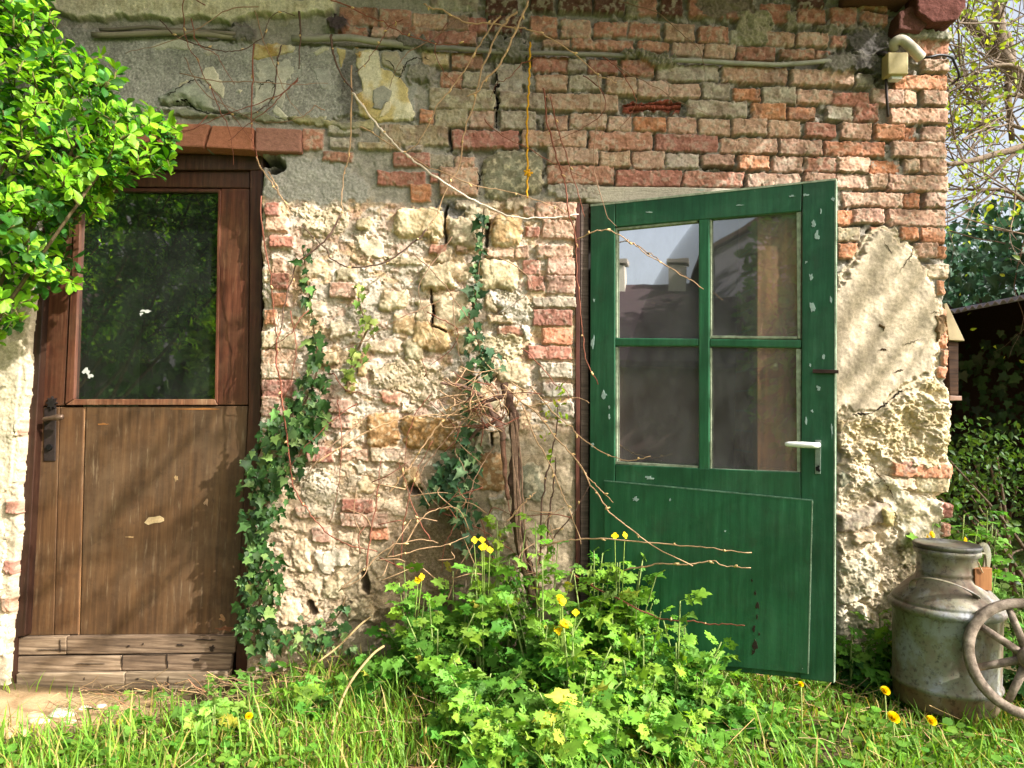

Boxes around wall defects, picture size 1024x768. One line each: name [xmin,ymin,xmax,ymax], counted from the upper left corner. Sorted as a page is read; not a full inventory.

peeling [252,42,295,121]
peeling [311,46,416,123]
crack [493,67,501,130]
flaking render [290,202,388,261]
flaking render [474,288,534,376]
flaking render [934,315,948,342]
flaking render [368,357,448,413]
crack [854,339,921,416]
flaking render [293,465,342,518]
flaking render [831,380,951,568]
flaking render [313,545,352,574]
flaking render [836,552,881,639]